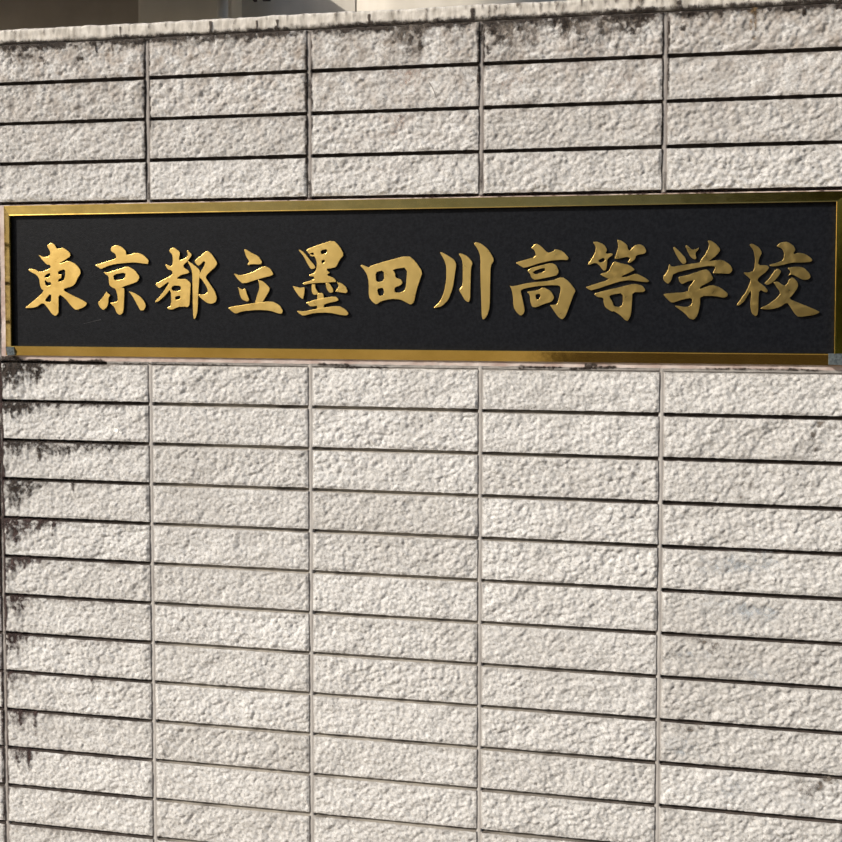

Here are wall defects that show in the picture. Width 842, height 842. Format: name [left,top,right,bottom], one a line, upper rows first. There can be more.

leakage [0,0,842,202]
leakage [0,356,135,819]